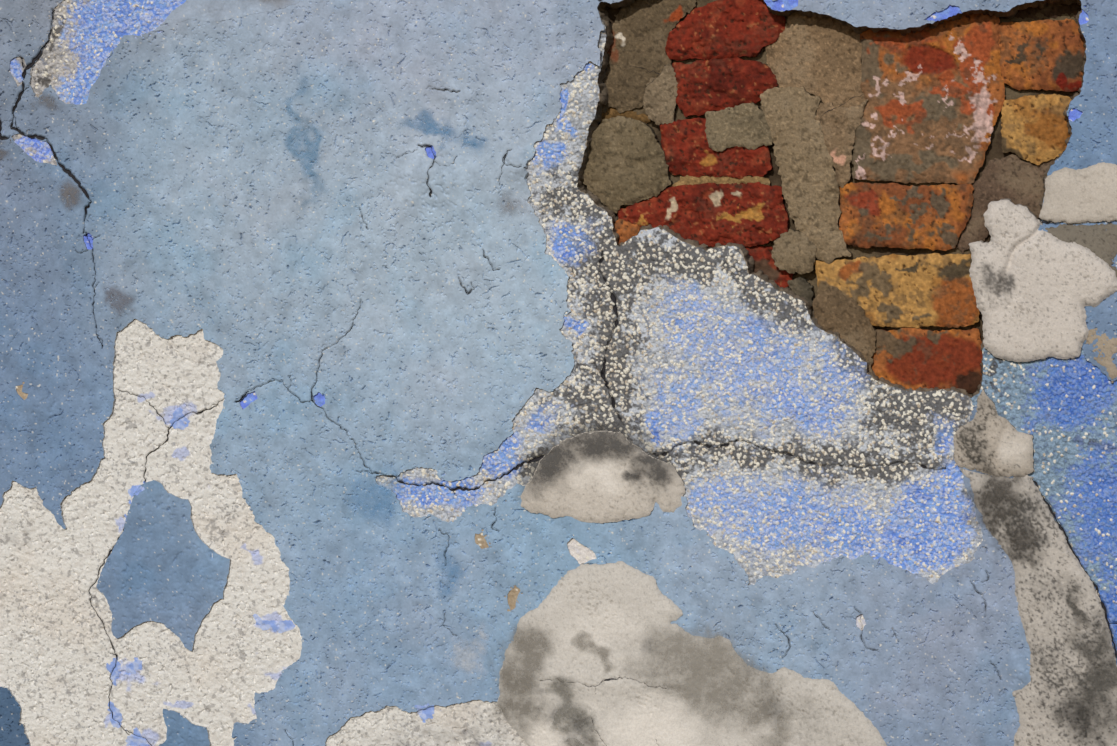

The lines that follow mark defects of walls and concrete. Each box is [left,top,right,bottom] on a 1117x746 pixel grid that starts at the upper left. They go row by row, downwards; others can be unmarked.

peeling [8,0,300,110]
crack [0,10,103,348]
crack [1039,218,1117,226]
crack [594,251,621,420]
flaking render [376,0,1117,665]
peeling [0,319,302,746]
crack [646,440,946,470]
crack [1032,479,1117,658]
peeling [326,699,529,746]